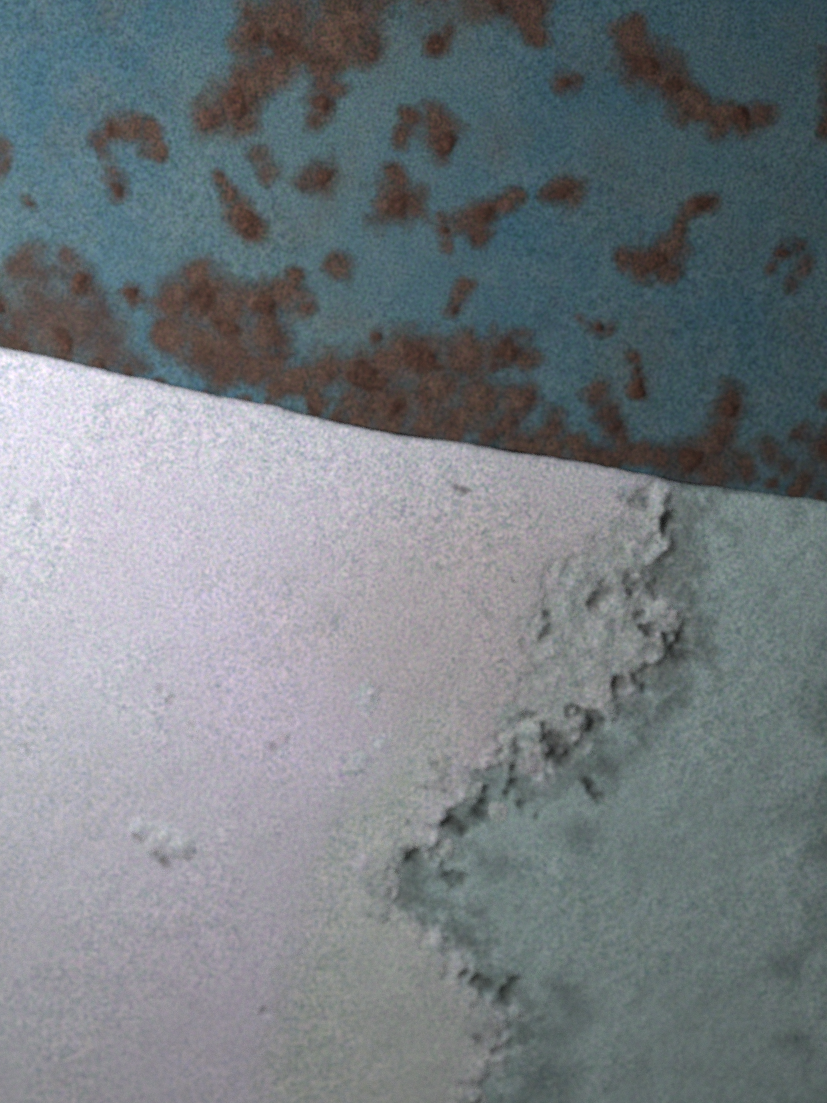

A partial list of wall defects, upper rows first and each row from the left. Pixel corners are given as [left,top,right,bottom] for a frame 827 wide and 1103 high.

rust [194,0,394,134]
rust [425,26,453,56]
rust [464,0,550,47]
rust [611,14,775,138]
rust [92,115,167,163]
rust [394,103,458,162]
rust [214,171,266,241]
rust [375,163,526,252]
rust [614,195,718,283]
rust [0,247,146,377]
rust [122,260,753,487]
spalling [221,473,827,1103]